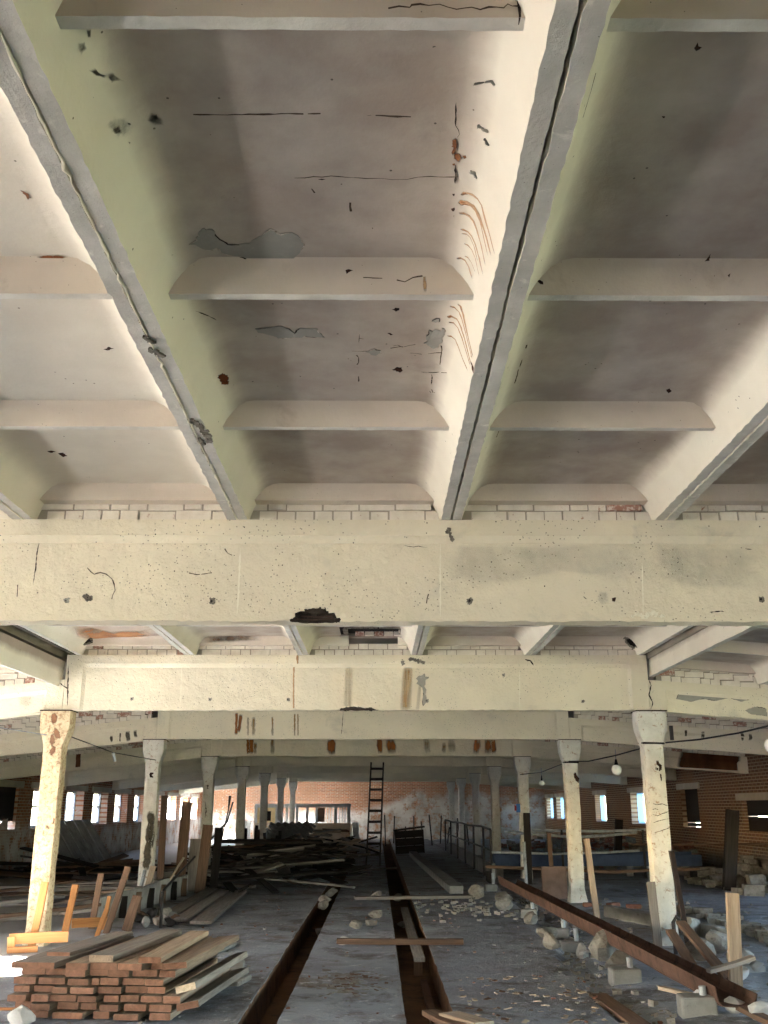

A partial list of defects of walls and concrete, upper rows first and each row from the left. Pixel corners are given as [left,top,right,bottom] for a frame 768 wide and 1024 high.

crack [388,1,521,25]
crack [473,79,495,87]
crack [193,110,321,118]
crack [477,124,489,146]
corrosion [452,105,494,276]
peeling [189,228,305,259]
peeling [424,318,446,349]
corrosion [447,305,474,374]
spalling [285,604,346,623]
peeling [401,657,429,706]
peeling [676,694,767,716]
damp [143,811,155,870]